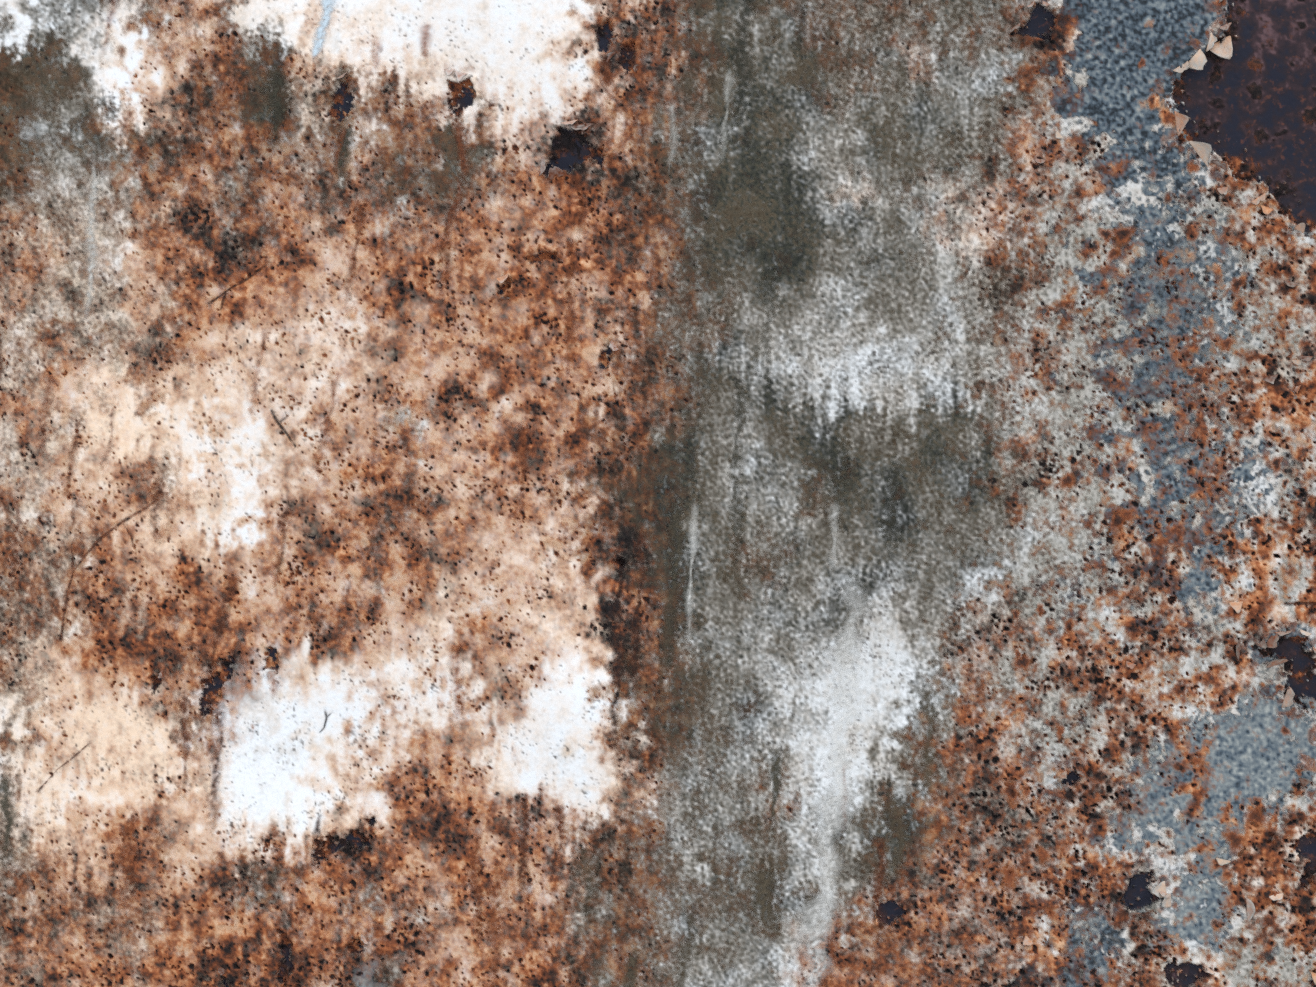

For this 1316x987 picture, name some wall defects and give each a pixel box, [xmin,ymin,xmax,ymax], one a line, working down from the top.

peeling [539,120,604,181]
peeling [1170,0,1316,236]
water stain [1057,281,1091,335]
corrosion [0,0,697,987]
water stain [553,0,1052,987]
corrosion [798,0,1316,987]
peeling [1282,824,1316,888]